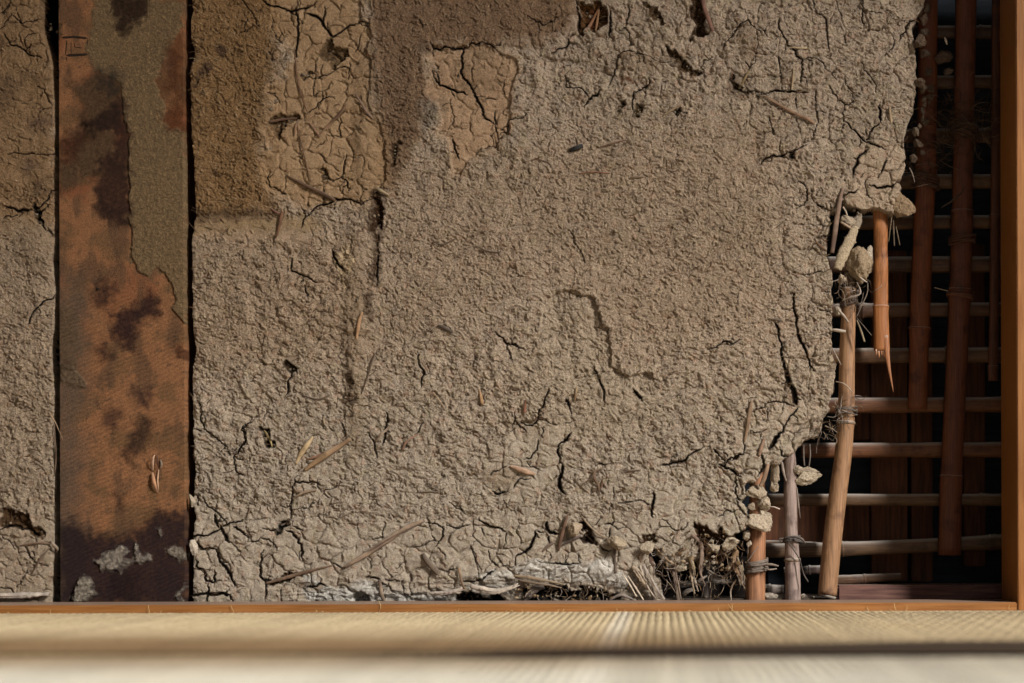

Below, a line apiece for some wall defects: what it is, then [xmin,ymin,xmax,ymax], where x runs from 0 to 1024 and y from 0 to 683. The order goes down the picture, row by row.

damp [112,0,147,36]
damp [83,72,132,225]
crack [240,0,380,284]
crack [420,21,527,158]
crack [697,0,918,210]
damp [110,294,160,350]
crack [194,367,292,476]
crack [342,414,388,454]
crack [491,390,572,495]
damp [60,510,190,602]
crack [190,475,337,602]
crack [367,463,688,595]